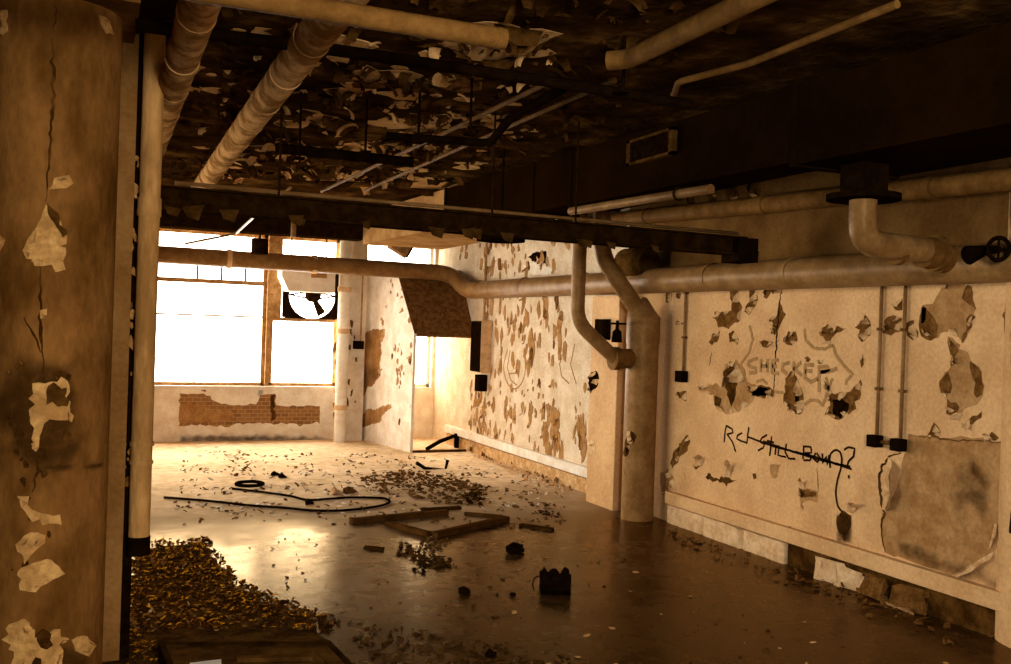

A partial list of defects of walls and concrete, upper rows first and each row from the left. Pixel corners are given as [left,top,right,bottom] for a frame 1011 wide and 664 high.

crack [45,3,57,202]
peeling [215,0,667,196]
peeling [22,204,68,272]
crack [23,268,45,369]
peeling [6,360,74,592]
peeling [179,390,320,427]
peeling [347,306,412,407]
peeling [468,296,599,483]
peeling [698,359,804,415]
peeling [709,289,797,348]
peeling [819,284,1001,577]
peeling [2,618,97,664]